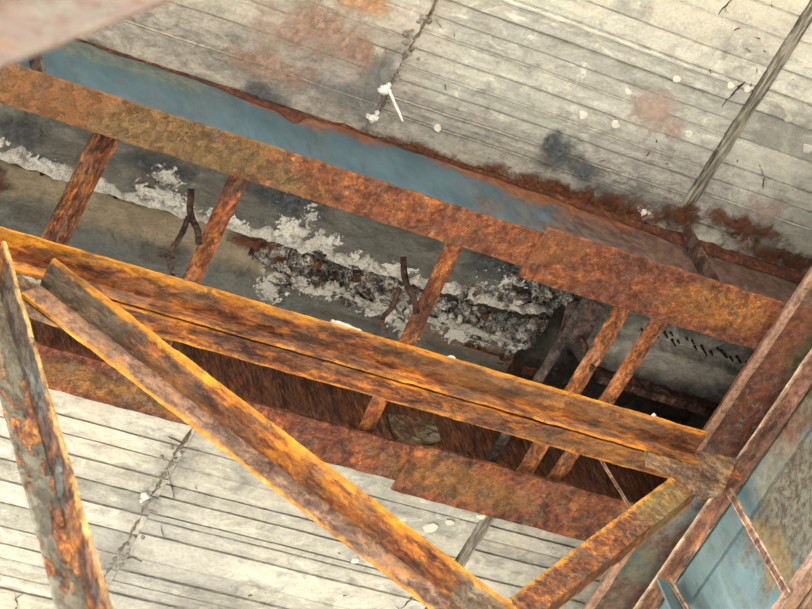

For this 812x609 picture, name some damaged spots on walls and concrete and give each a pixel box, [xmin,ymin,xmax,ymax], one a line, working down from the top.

corrosion [230,0,387,90]
crack [378,0,443,116]
leakage [0,117,74,182]
leakage [94,156,213,224]
corrosion [227,236,286,264]
leakage [226,184,429,290]
spalling [248,240,423,320]
leakage [441,255,549,315]
spalling [430,269,575,357]
corrosion [381,136,812,273]
corrosion [463,343,537,378]
crack [101,428,193,582]